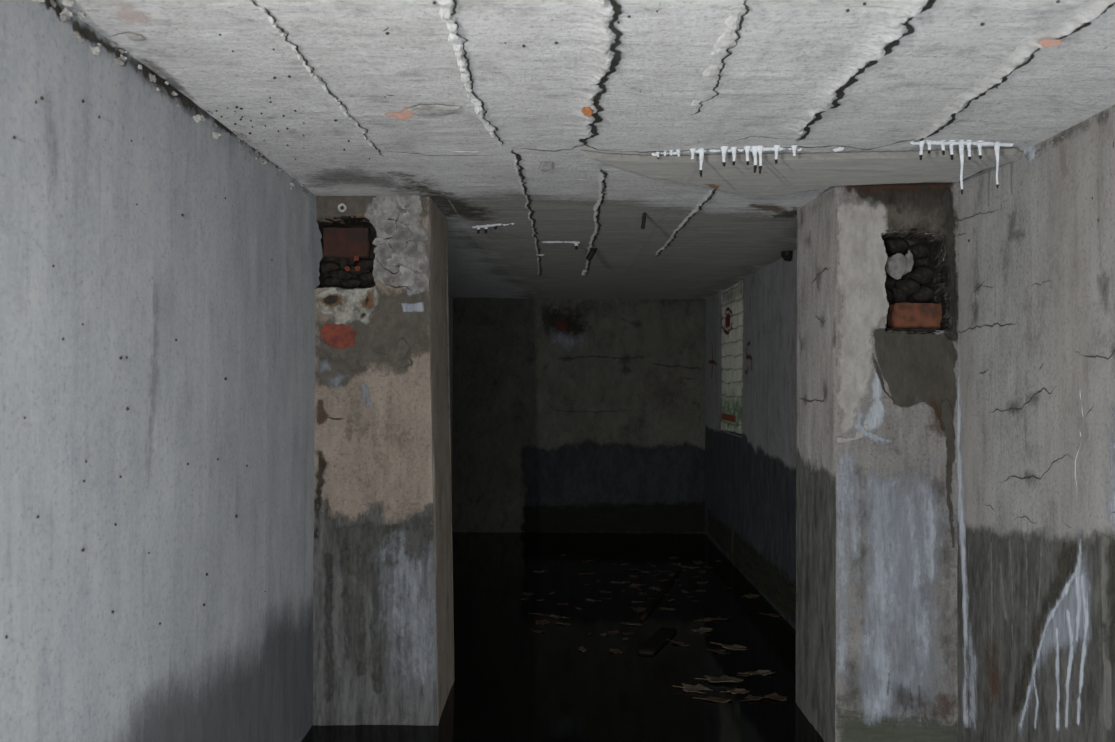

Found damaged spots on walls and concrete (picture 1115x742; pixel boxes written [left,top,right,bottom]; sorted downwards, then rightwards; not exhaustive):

spalling [44,0,126,66]
spalling [142,64,197,110]
leakage [651,147,802,156]
spalling [320,323,356,349]
spalling [315,216,377,290]
leakage [316,286,379,324]
spalling [881,228,953,334]
leakage [521,183,1115,742]
leakage [133,452,438,742]